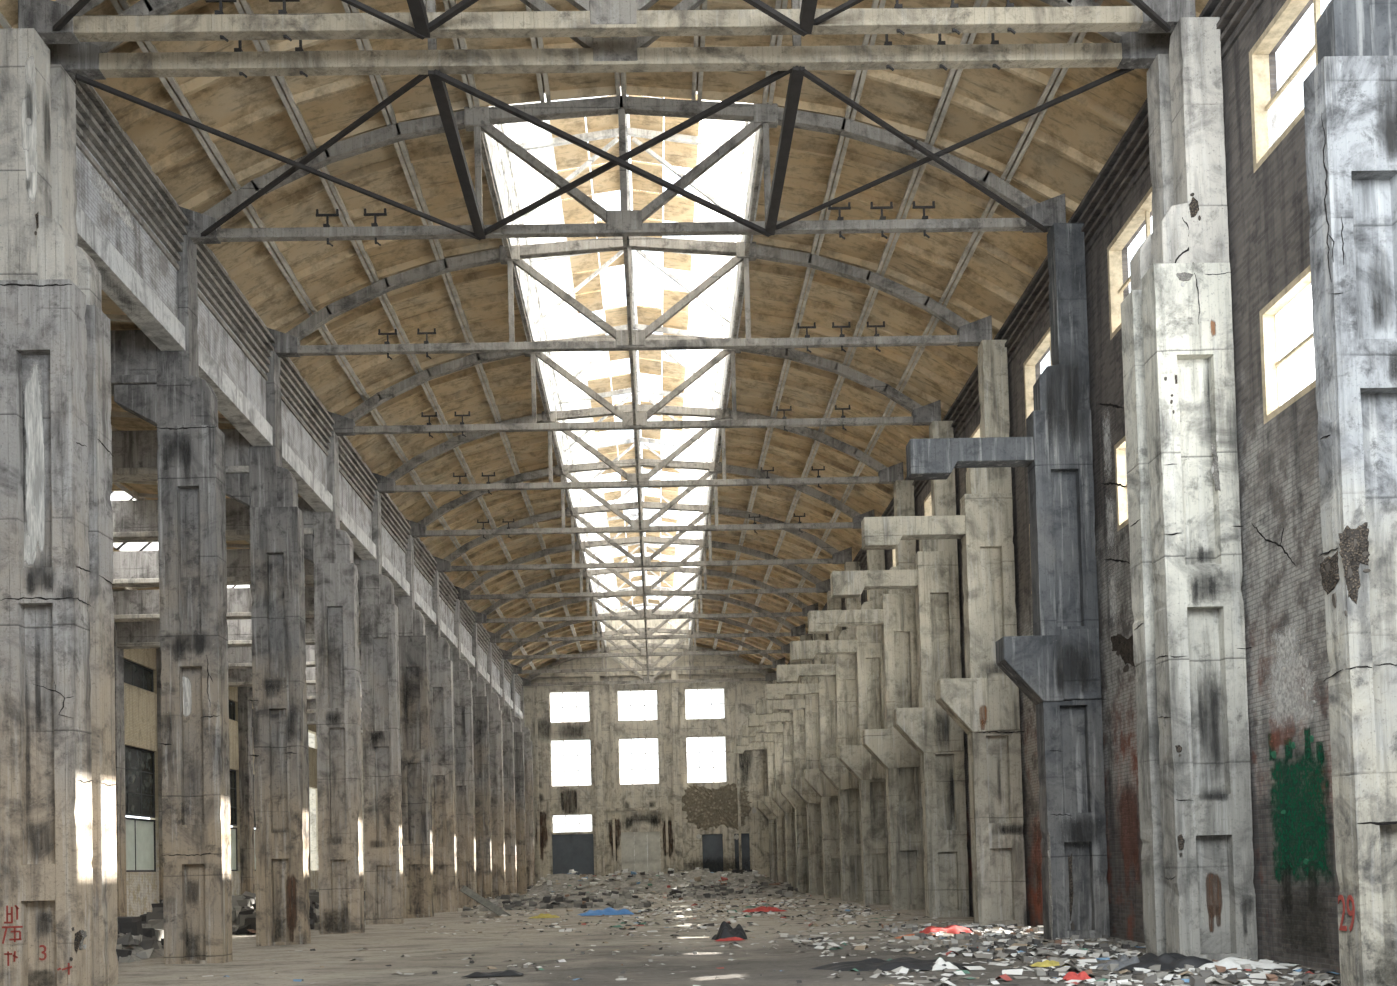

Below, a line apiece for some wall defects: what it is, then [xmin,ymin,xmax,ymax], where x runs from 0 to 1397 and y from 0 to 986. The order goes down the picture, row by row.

spalling [1189,193,1201,221]
crack [1234,524,1338,565]
spalling [1320,522,1371,616]
spalling [1111,634,1135,672]
crack [1323,663,1397,682]
crack [1357,819,1397,827]